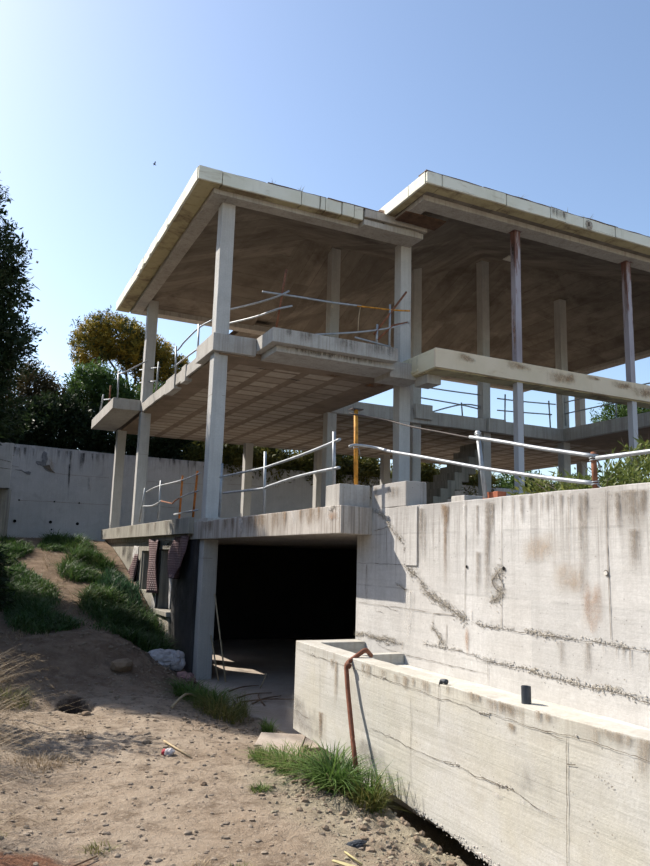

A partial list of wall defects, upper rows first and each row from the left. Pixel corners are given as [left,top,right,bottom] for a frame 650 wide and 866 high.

damp [616,490,645,517]
crack [307,510,649,851]